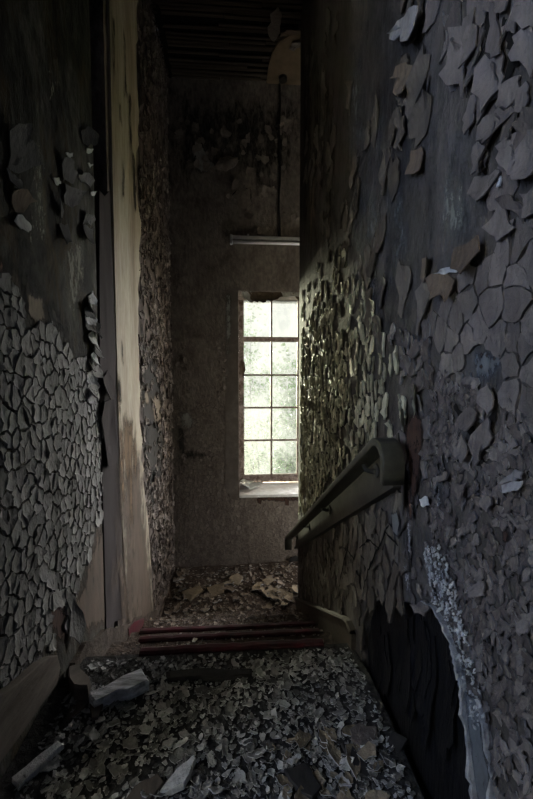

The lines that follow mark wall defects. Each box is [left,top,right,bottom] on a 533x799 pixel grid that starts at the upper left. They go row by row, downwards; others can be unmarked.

peeling [6,123,43,232]
peeling [53,125,99,245]
peeling [0,273,118,689]
peeling [137,0,298,615]
crack [174,398,411,626]
peeling [225,0,533,799]
water stain [423,544,485,730]